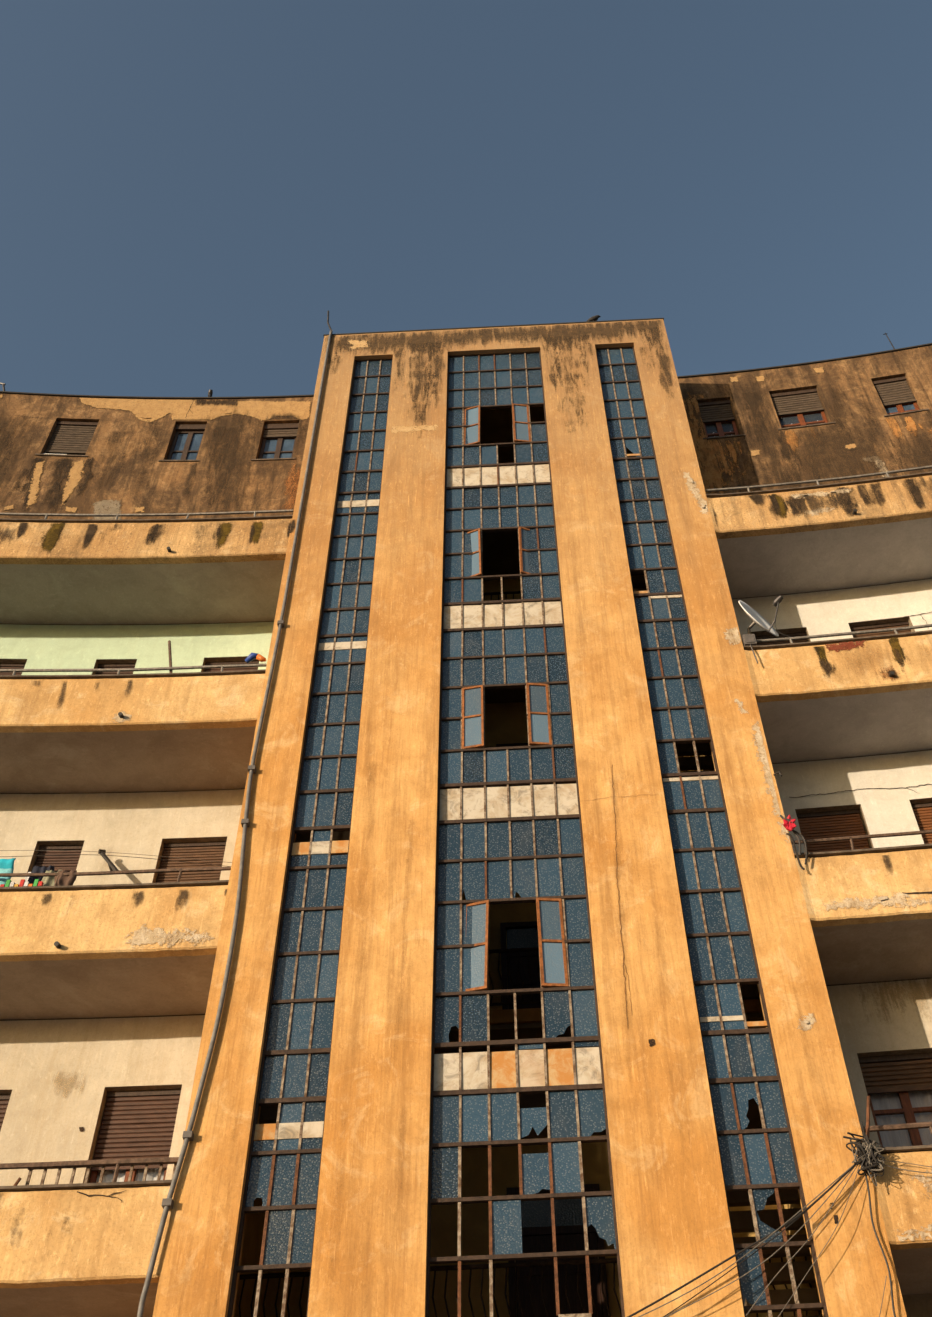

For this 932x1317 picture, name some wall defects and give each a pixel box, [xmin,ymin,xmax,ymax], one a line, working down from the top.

damp [327,320,672,425]
peeling [4,461,45,510]
damp [0,419,125,551]
peeling [62,460,85,513]
damp [182,399,254,549]
damp [731,380,932,518]
damp [145,524,164,544]
damp [249,521,263,544]
peeling [823,892,932,911]
peeling [894,1224,932,1241]